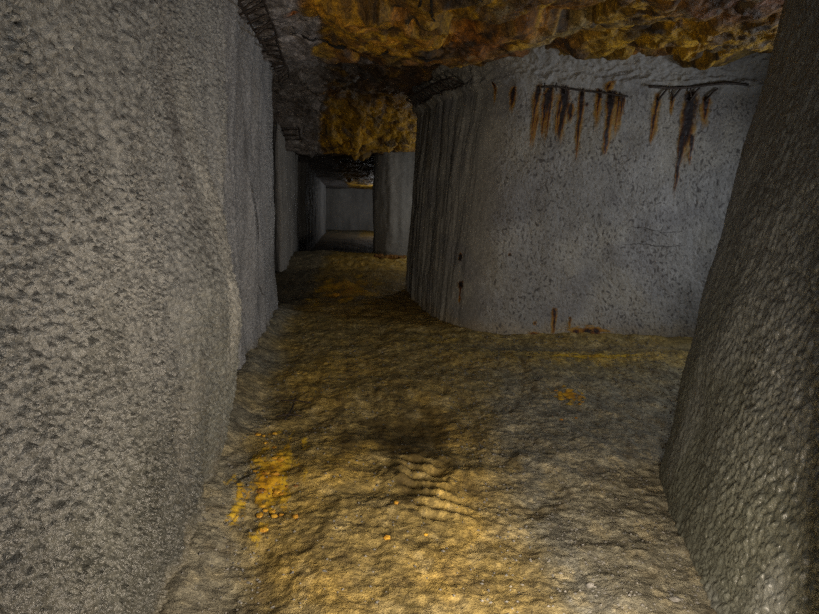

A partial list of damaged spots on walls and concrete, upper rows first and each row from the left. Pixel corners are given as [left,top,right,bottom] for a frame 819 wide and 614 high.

corrosion [530,81,625,157]
corrosion [650,93,711,189]